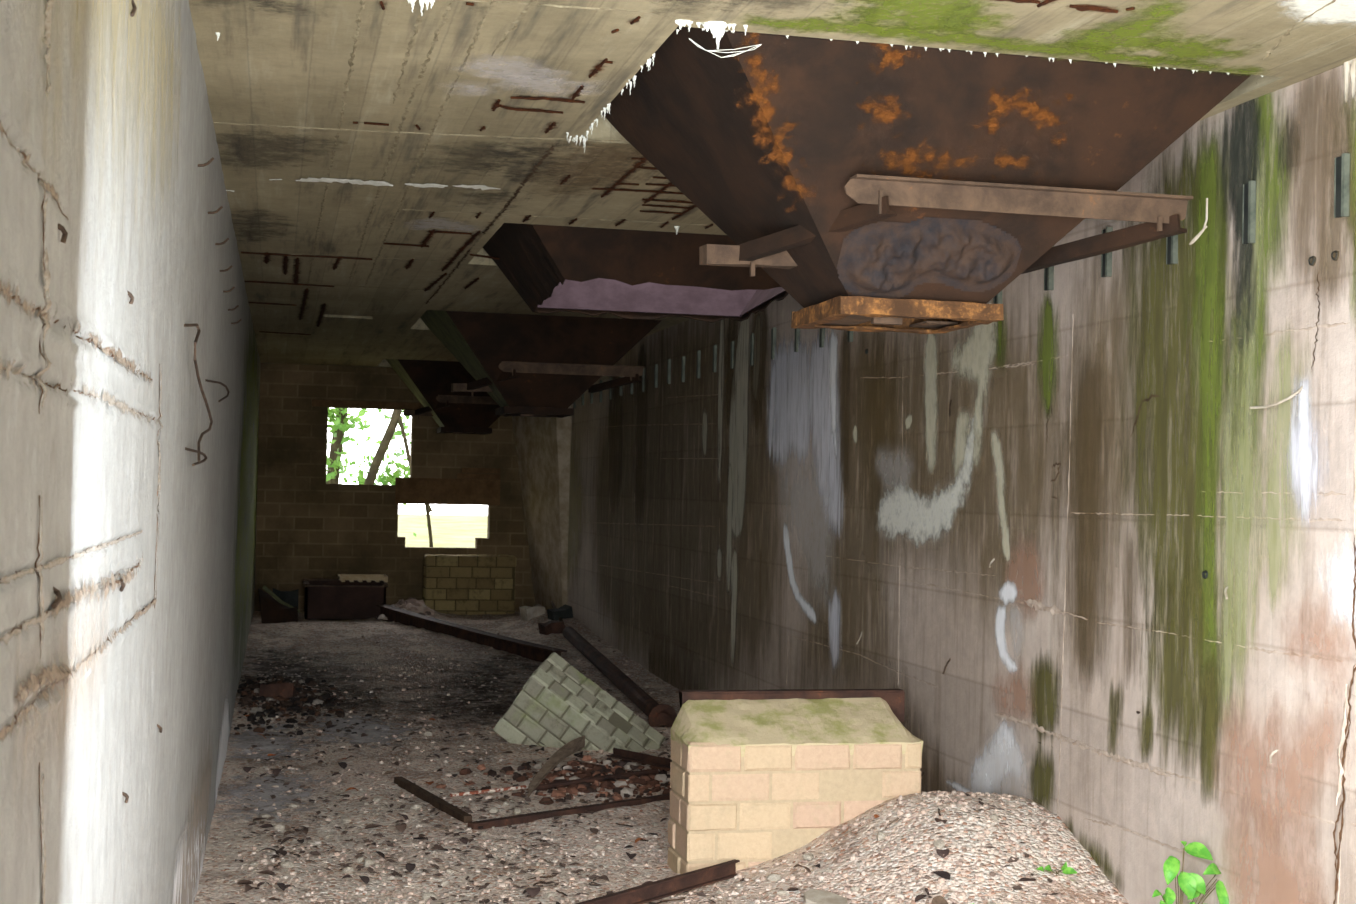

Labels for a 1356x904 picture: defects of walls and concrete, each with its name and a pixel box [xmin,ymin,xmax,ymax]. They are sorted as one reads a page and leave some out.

corrosion [746,33,807,198]
corrosion [862,97,899,123]
corrosion [880,43,904,67]
leakage [1222,99,1260,339]
leakage [1280,58,1356,290]
leakage [567,311,1054,690]
leakage [1075,294,1125,666]
leakage [1291,383,1318,513]
leakage [1332,553,1356,621]
leakage [901,712,1022,794]
crack [1333,538,1356,904]